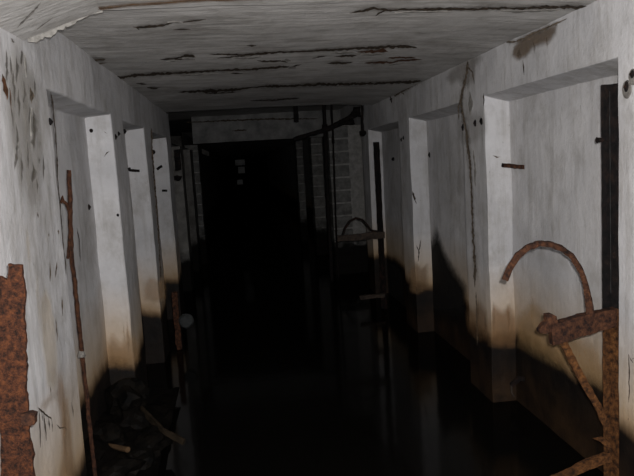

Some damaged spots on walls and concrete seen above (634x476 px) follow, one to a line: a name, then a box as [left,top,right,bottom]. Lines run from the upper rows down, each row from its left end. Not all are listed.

crack [134,19,206,30]
crack [352,5,586,43]
leakage [513,27,555,58]
crack [118,45,422,101]
crack [458,61,478,344]
rust [0,263,38,476]